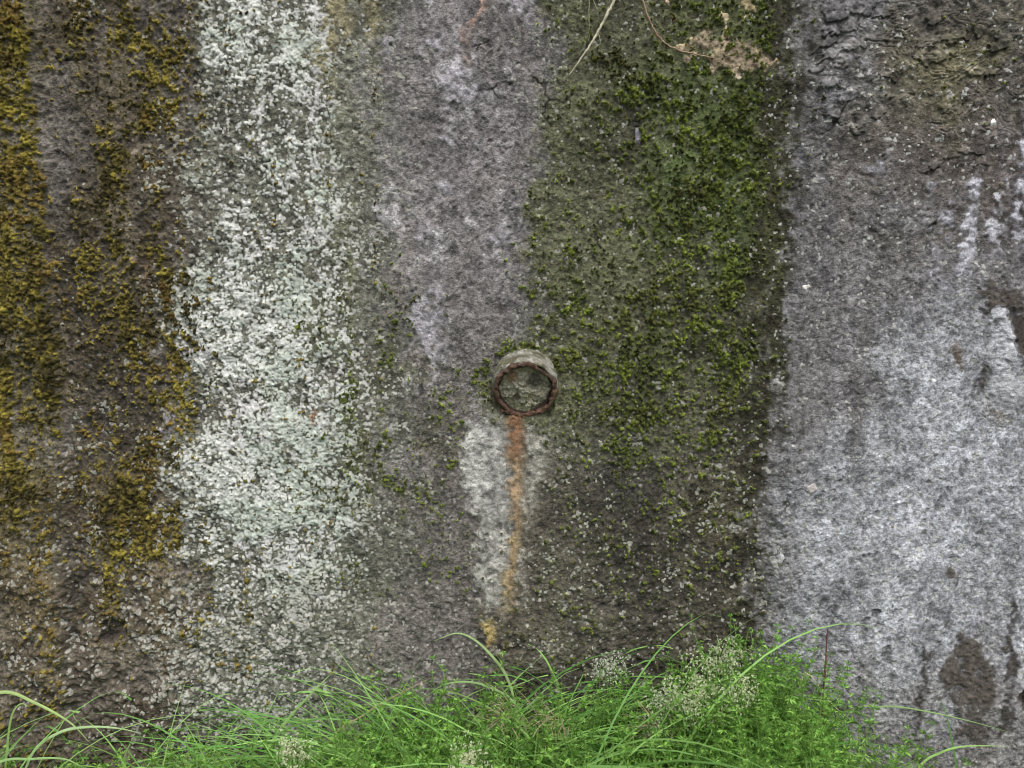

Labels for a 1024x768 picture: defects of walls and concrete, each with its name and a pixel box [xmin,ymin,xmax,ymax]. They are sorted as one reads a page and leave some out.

water stain [459,412,548,623]
rust [500,408,522,607]
rust [481,621,495,647]
water stain [911,600,1021,763]